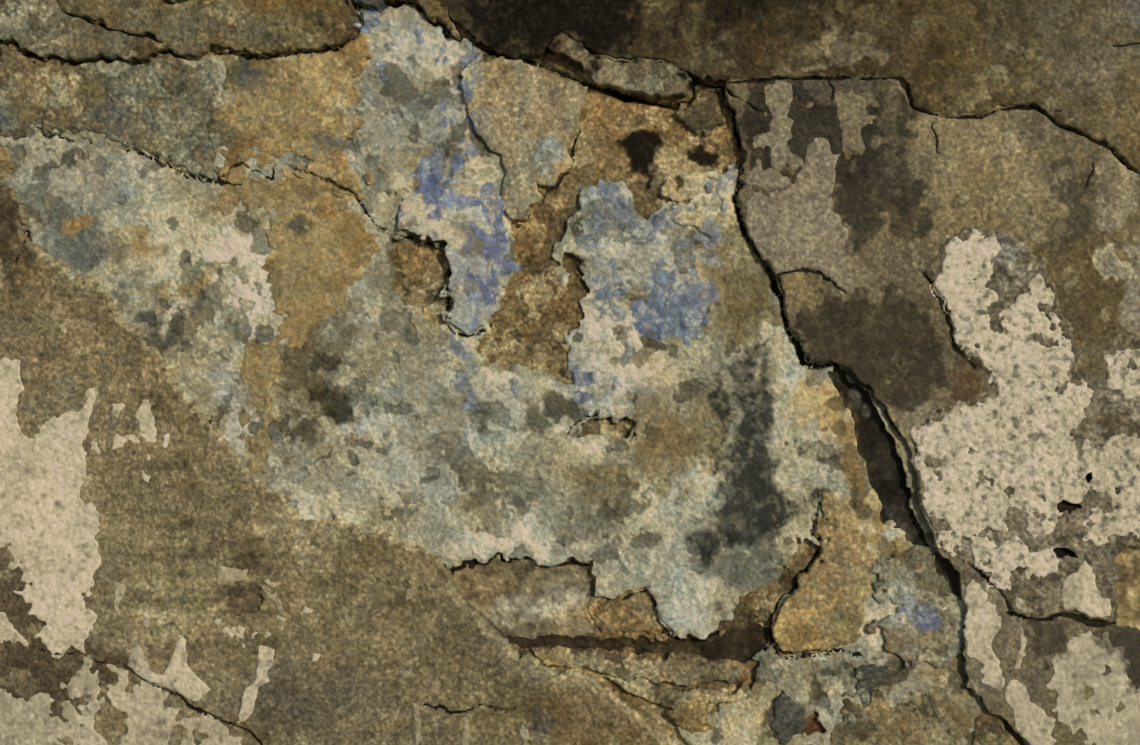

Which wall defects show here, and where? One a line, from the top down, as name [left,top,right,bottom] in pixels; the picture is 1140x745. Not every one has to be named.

crack [0,0,1140,370]
spalling [0,5,914,639]
peeling [828,228,1140,596]
peeling [0,357,286,745]
crack [40,649,263,745]
crack [423,703,516,715]
crack [450,552,590,574]
crack [614,591,723,646]
spalling [448,554,1005,745]
crack [770,502,862,660]
peeling [942,580,1140,745]
peeling [1061,561,1111,618]